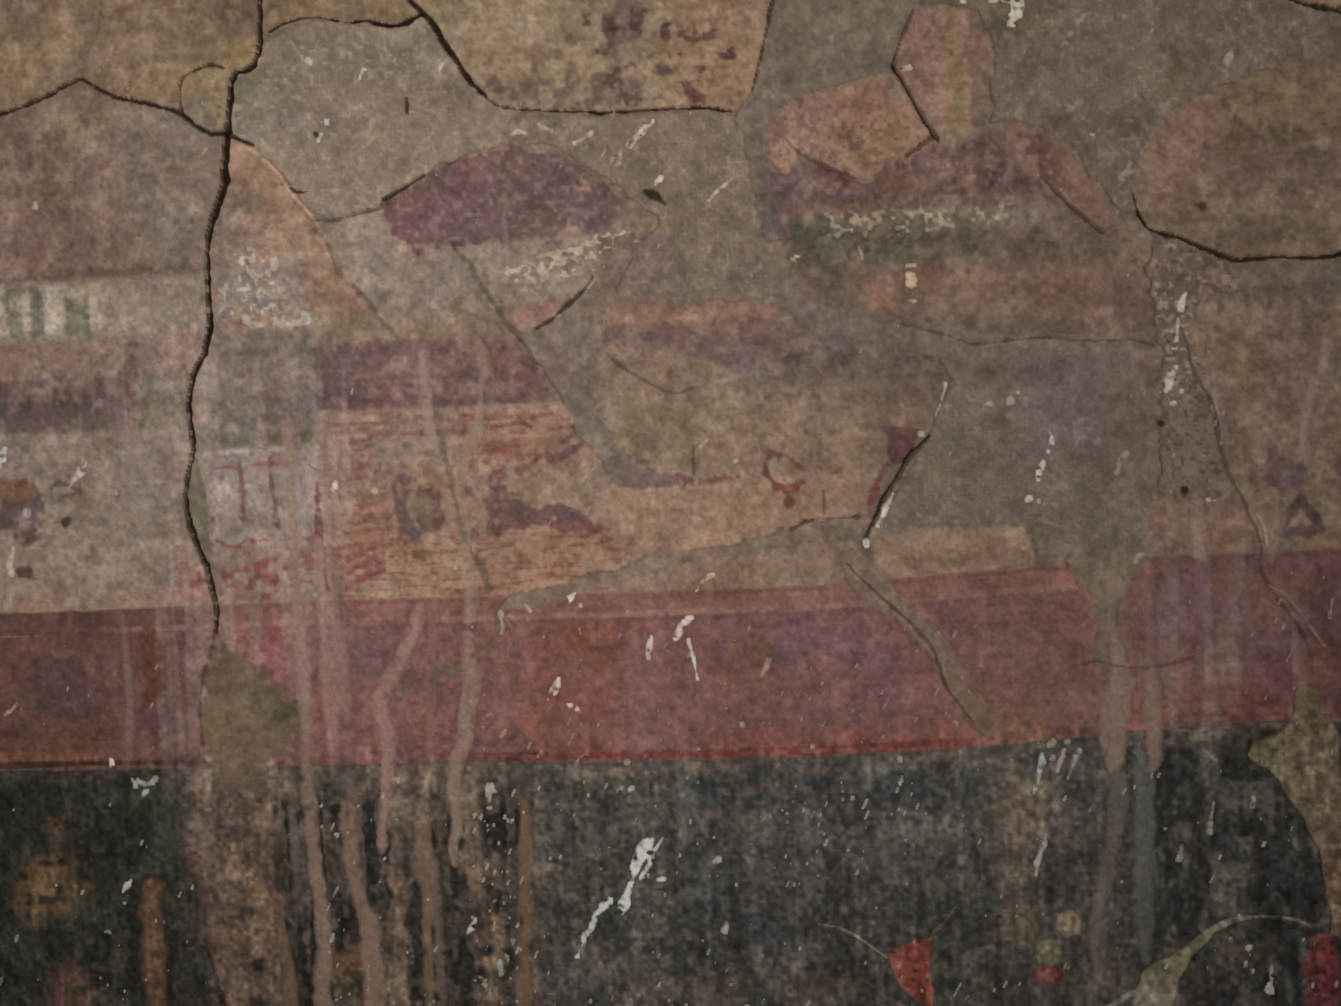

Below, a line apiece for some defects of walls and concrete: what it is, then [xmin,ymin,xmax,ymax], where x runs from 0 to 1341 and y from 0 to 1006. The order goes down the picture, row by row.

crack [1290,0,1341,14]
crack [1045,179,1104,234]
crack [1133,192,1341,263]
crack [0,0,776,765]
damp [189,335,515,1006]
damp [512,796,535,1006]